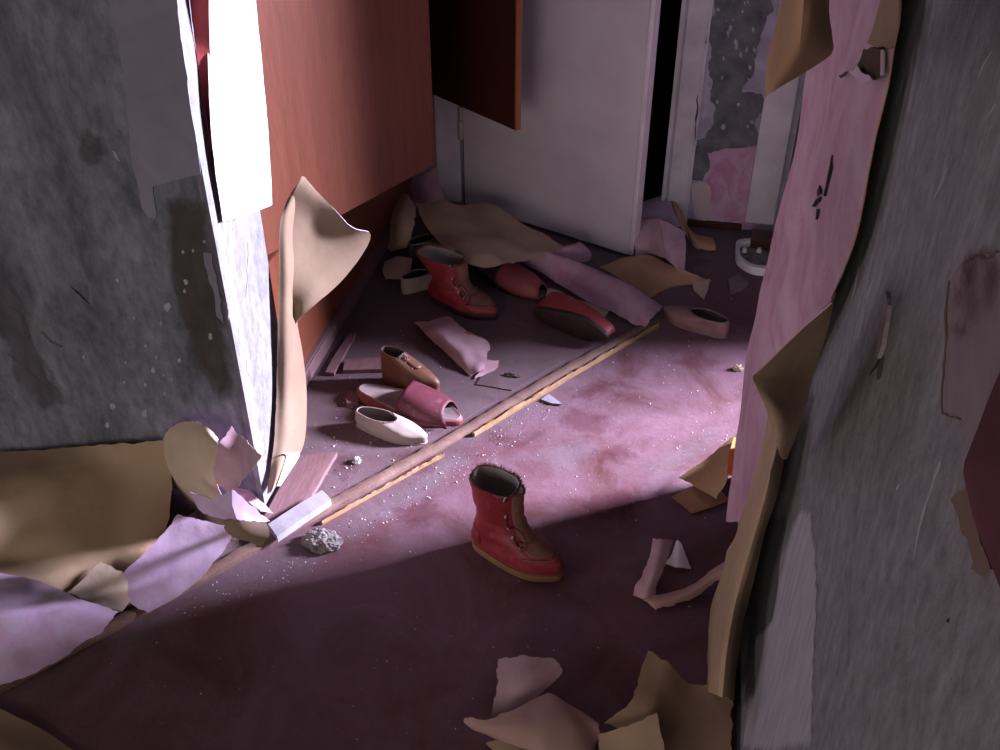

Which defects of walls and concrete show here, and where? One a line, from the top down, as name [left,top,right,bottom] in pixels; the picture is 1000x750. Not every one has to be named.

spalling [692,0,774,181]